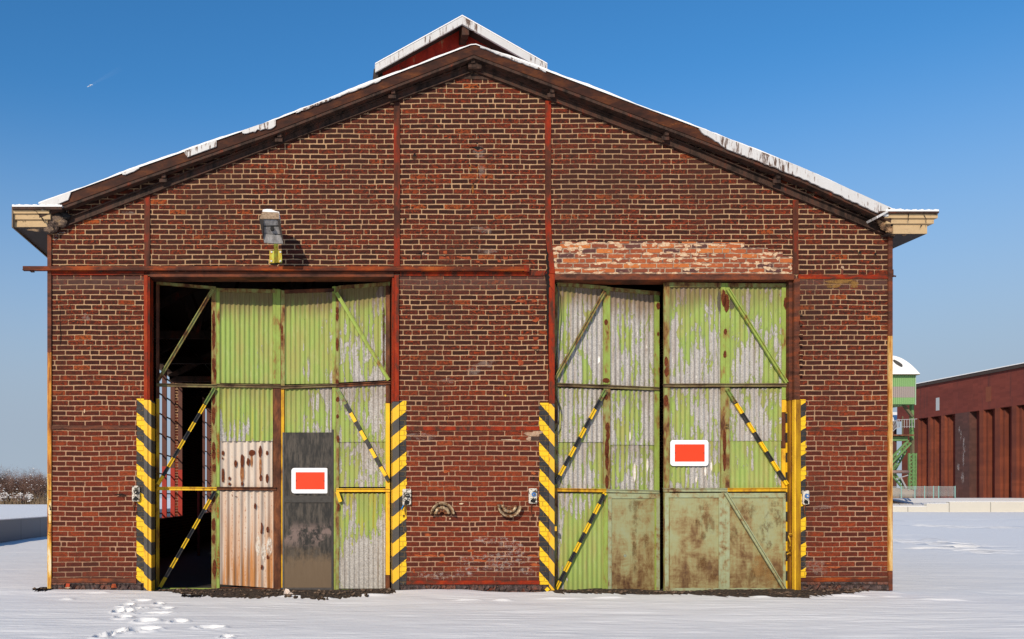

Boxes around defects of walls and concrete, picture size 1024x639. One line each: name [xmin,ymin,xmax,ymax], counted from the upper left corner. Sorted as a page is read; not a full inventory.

peeling [553,241,793,274]
corrosion [721,289,729,312]